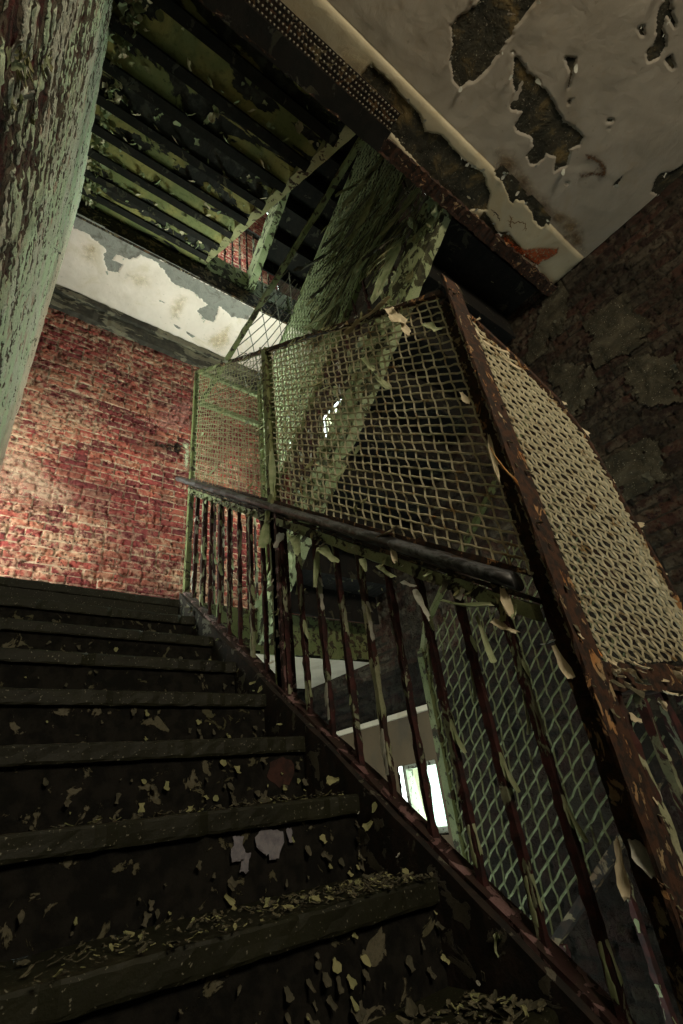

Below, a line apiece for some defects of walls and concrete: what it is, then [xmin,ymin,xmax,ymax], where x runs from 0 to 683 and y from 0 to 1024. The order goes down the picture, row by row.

flaking render [639,0,675,72]
peeling [6,38,53,125]
flaking render [449,0,583,187]
flaking render [73,0,319,322]
flaking render [361,65,552,271]
flaking render [651,164,683,200]
rust [503,236,558,266]
peeling [316,191,442,479]
peeling [255,538,279,648]
peeling [605,658,683,699]
peeling [115,778,170,819]
peeling [306,952,371,1024]